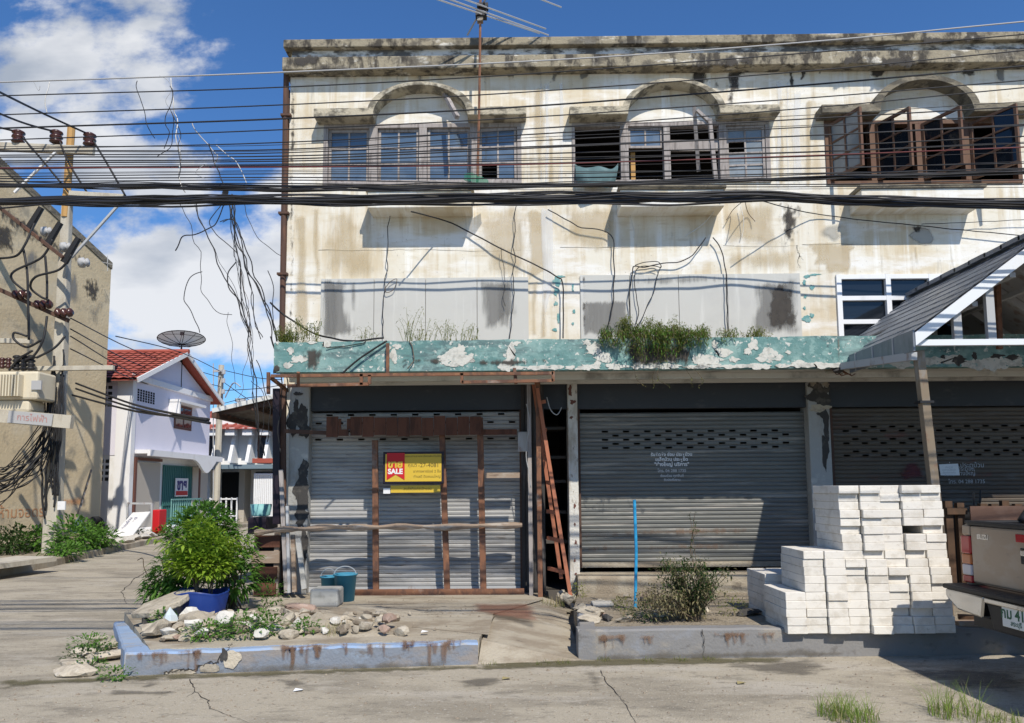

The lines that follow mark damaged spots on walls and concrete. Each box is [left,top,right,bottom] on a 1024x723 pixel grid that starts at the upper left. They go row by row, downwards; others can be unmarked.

damp [686,55,750,101]
damp [783,206,800,237]
damp [325,282,350,335]
damp [484,284,511,325]
damp [583,302,625,334]
damp [756,281,796,331]
peeling [273,342,308,374]
peeling [389,343,402,364]
peeling [437,344,475,367]
peeling [890,352,1024,373]
peeling [498,336,855,470]
peeling [292,459,309,566]